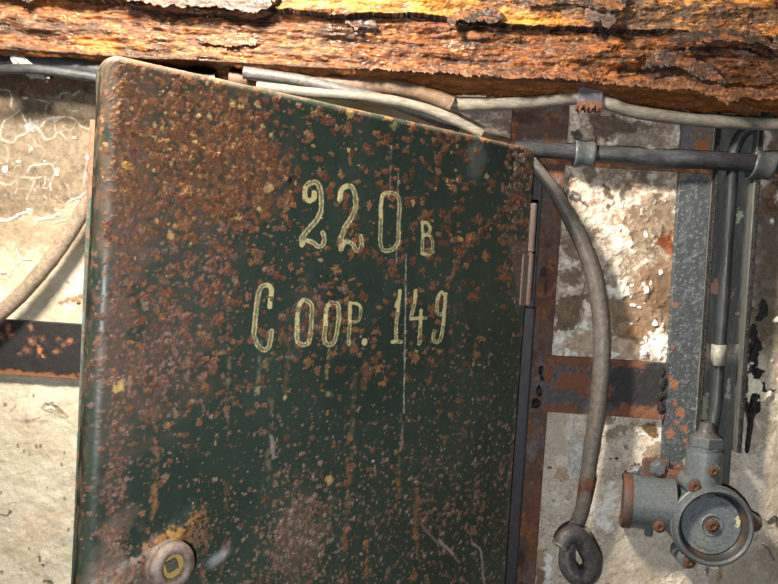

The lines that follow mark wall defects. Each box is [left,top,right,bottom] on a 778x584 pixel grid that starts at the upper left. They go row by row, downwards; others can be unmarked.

peeling [755,412,778,430]
peeling [659,565,722,584]